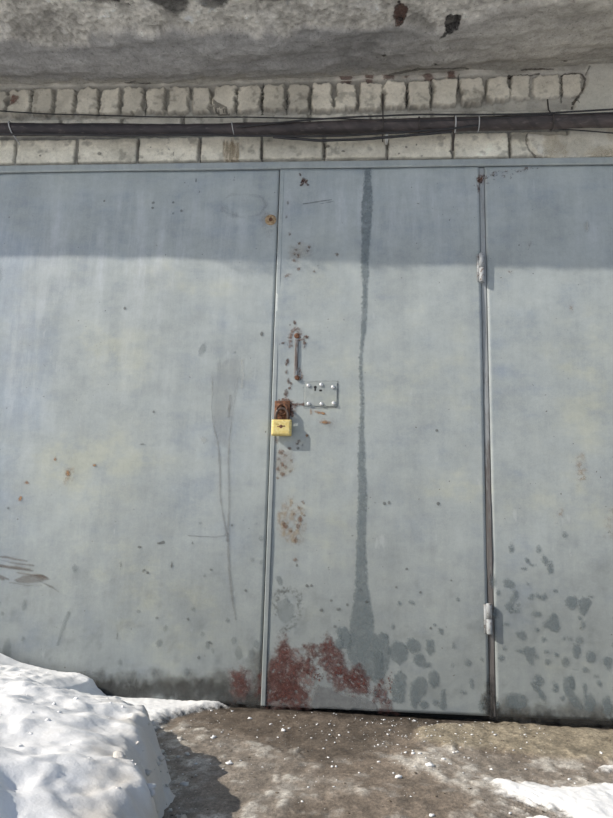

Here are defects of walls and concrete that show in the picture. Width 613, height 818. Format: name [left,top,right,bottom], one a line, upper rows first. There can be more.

spalling [393,1,408,27]
spalling [441,14,461,38]
crack [508,67,590,110]
leakage [361,168,372,309]
rust [278,359,305,417]
leakage [336,319,445,709]